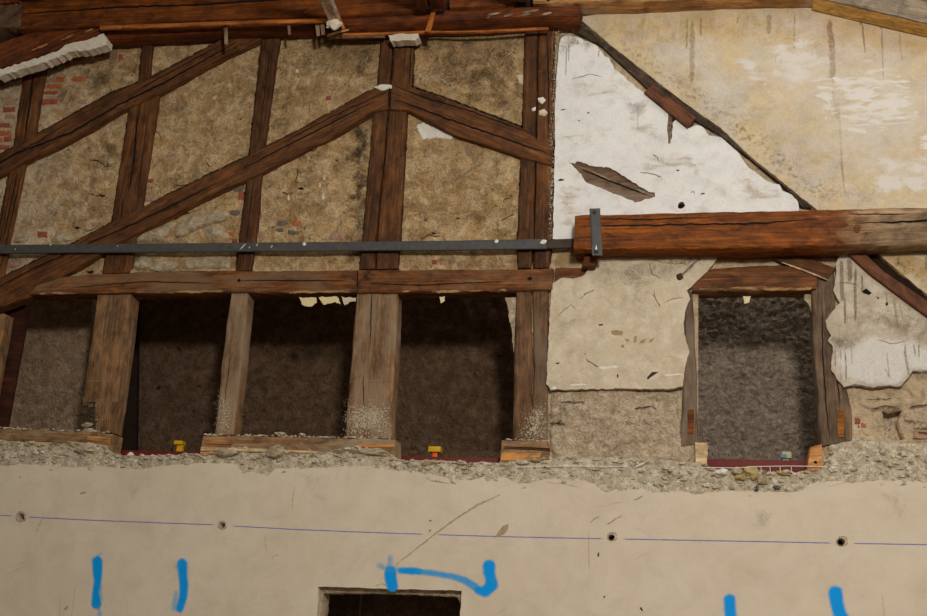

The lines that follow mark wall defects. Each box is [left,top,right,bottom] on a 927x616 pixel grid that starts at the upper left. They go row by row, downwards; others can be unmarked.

water stain [555,8,927,208]
spalling [572,162,655,202]
spalling [0,439,927,497]